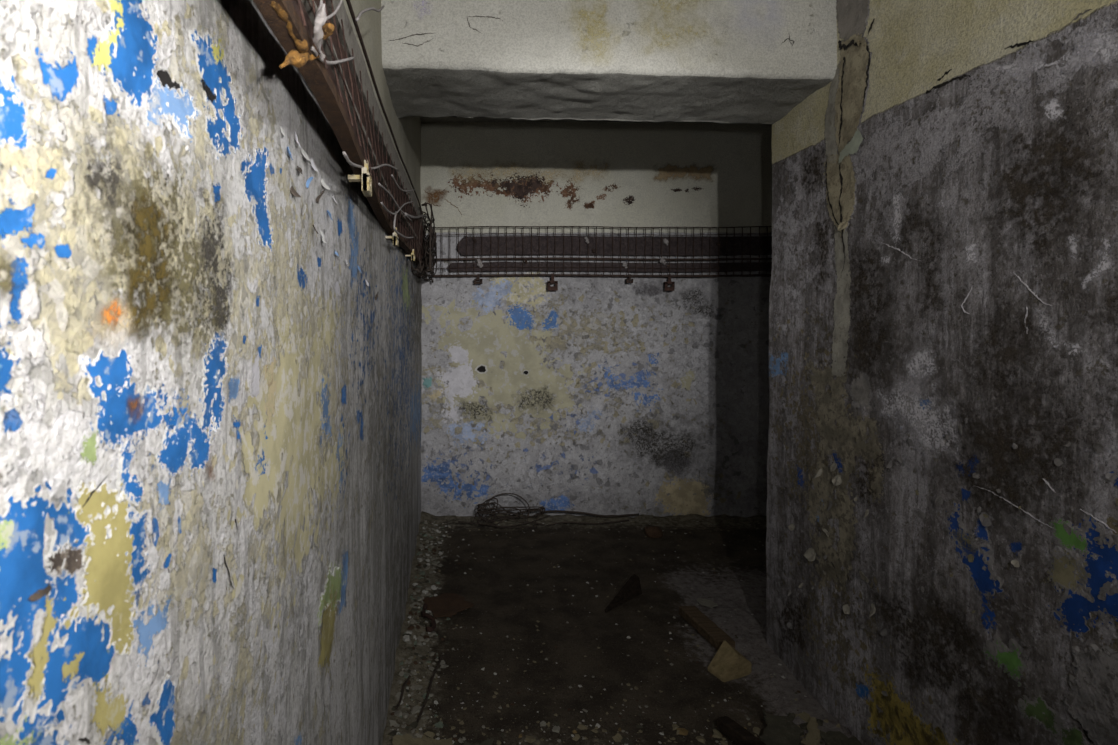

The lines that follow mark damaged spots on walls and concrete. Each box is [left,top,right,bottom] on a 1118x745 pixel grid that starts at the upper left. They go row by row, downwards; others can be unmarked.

water stain [0,259,15,293]
peeling [0,73,33,150]
peeling [35,0,274,252]
water stain [85,153,233,345]
corrosion [424,187,462,216]
crack [826,19,875,273]
water stain [1001,99,1100,259]
water stain [1083,239,1111,289]
peeling [0,127,378,745]
peeling [401,265,663,508]
water stain [879,350,1098,512]
peeling [1036,514,1118,652]